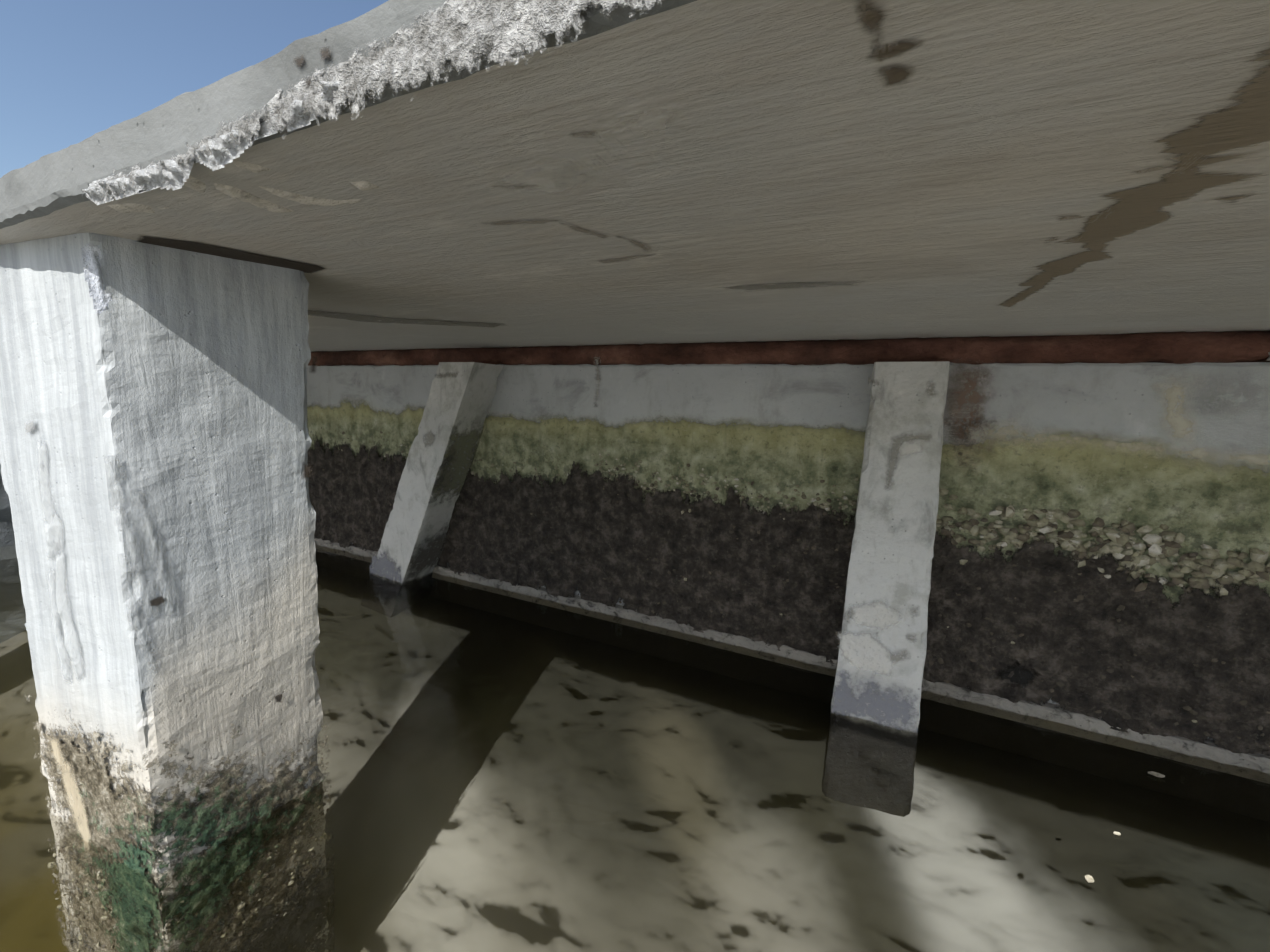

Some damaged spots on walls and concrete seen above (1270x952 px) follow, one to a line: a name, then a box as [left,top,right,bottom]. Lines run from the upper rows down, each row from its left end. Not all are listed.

spalling [82,0,661,213]
water stain [1001,49,1270,307]
rust [945,366,990,467]
water stain [369,553,401,584]
water stain [831,672,915,731]